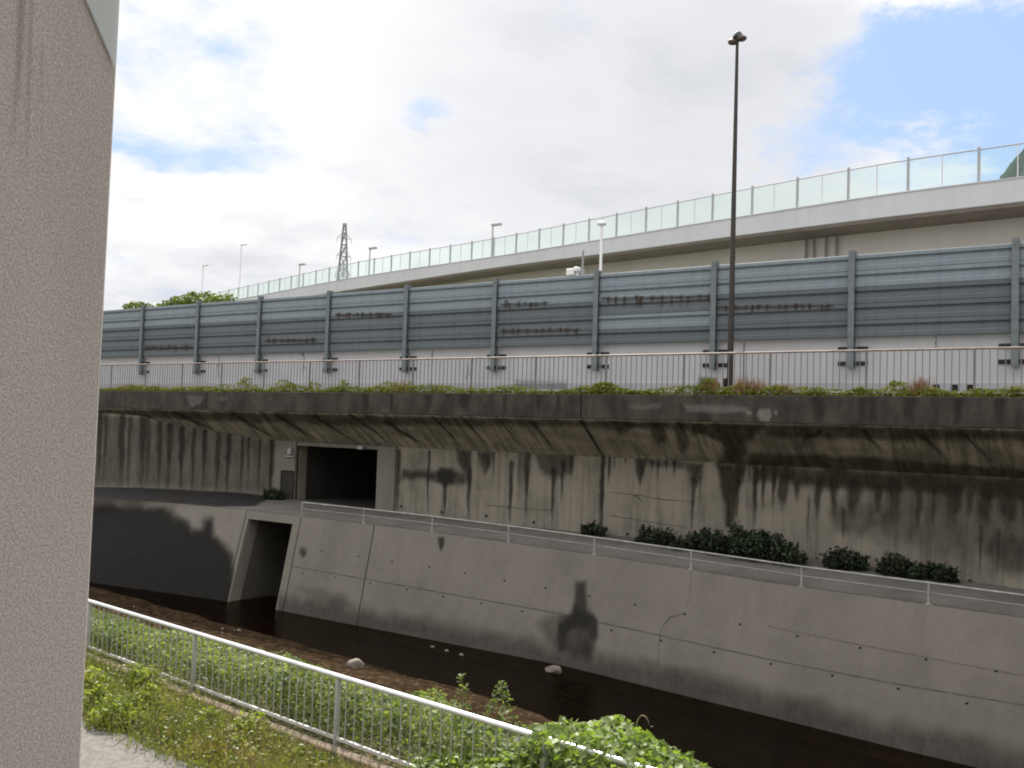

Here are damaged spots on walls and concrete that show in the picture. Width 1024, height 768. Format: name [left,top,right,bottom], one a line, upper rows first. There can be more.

water stain [97,394,1024,527]
water stain [541,583,605,676]